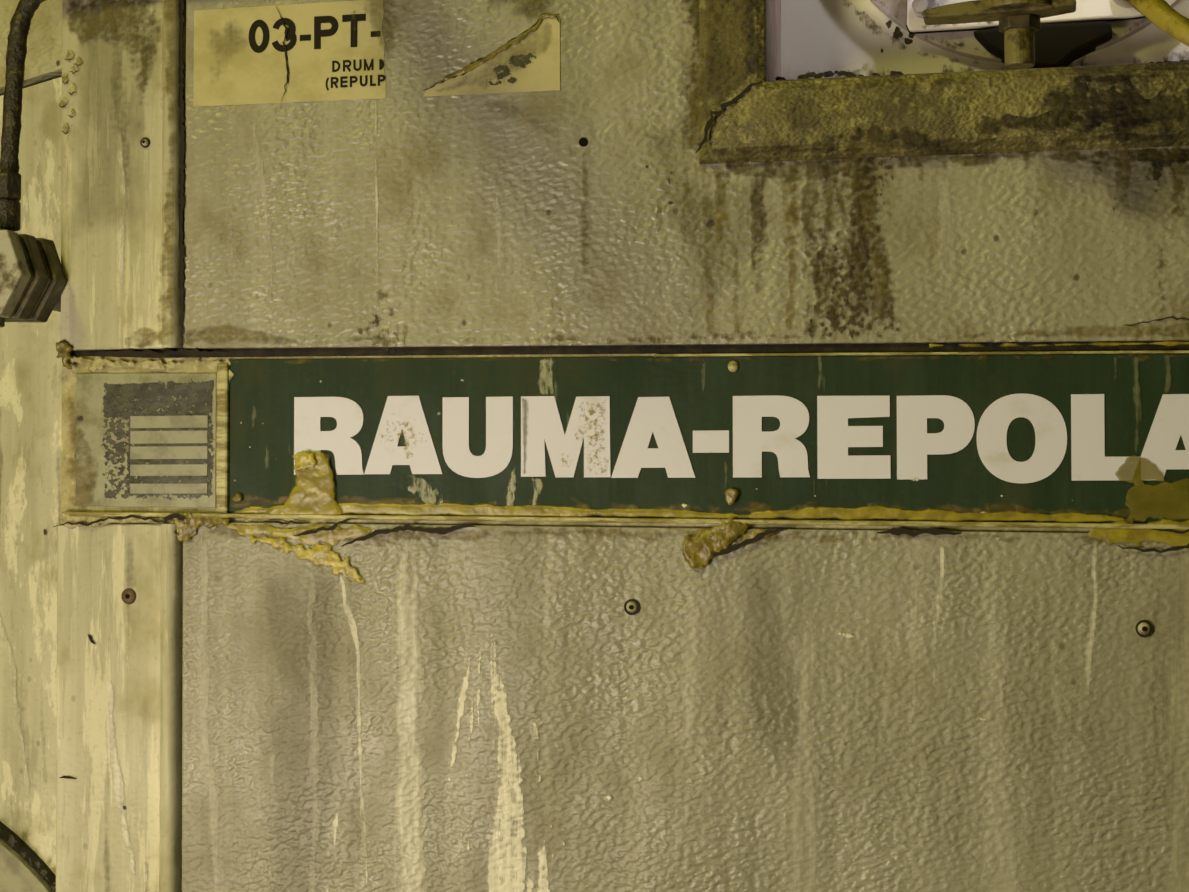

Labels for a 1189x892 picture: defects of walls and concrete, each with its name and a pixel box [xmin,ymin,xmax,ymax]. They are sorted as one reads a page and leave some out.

crack [276,7,289,101]
crack [696,82,762,153]
leakage [1152,148,1189,216]
leakage [448,634,565,892]